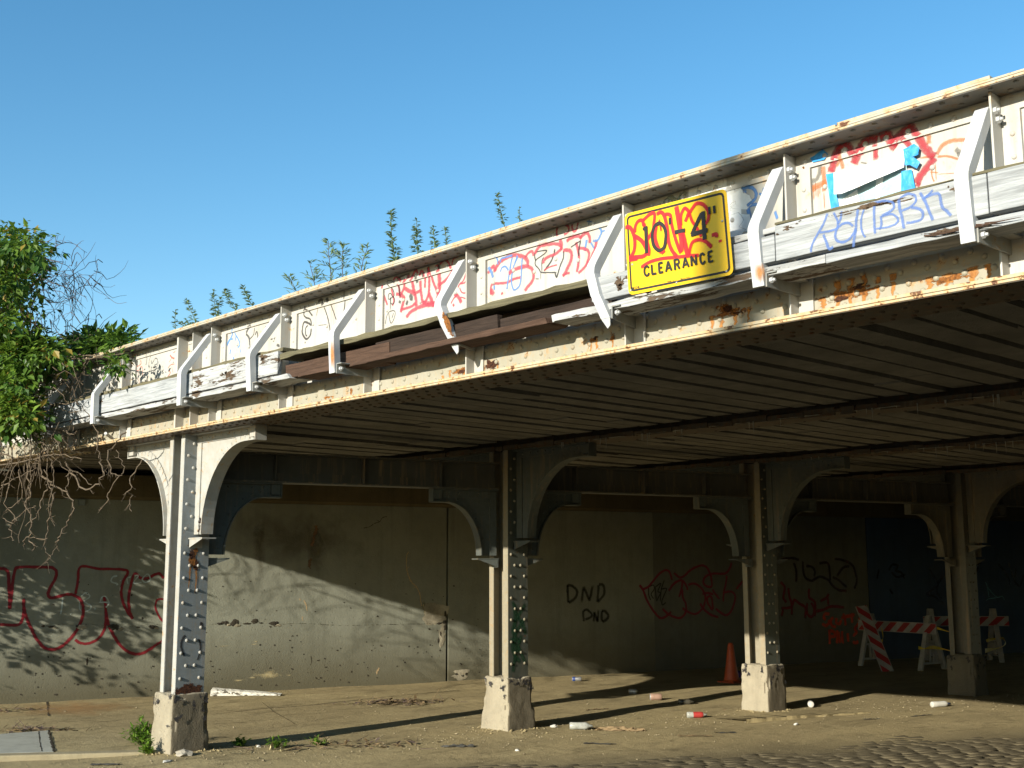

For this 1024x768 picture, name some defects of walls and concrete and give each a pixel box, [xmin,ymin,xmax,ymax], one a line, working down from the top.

corrosion [818,273,897,309]
corrosion [926,263,992,289]
corrosion [709,304,750,329]
corrosion [188,548,199,592]